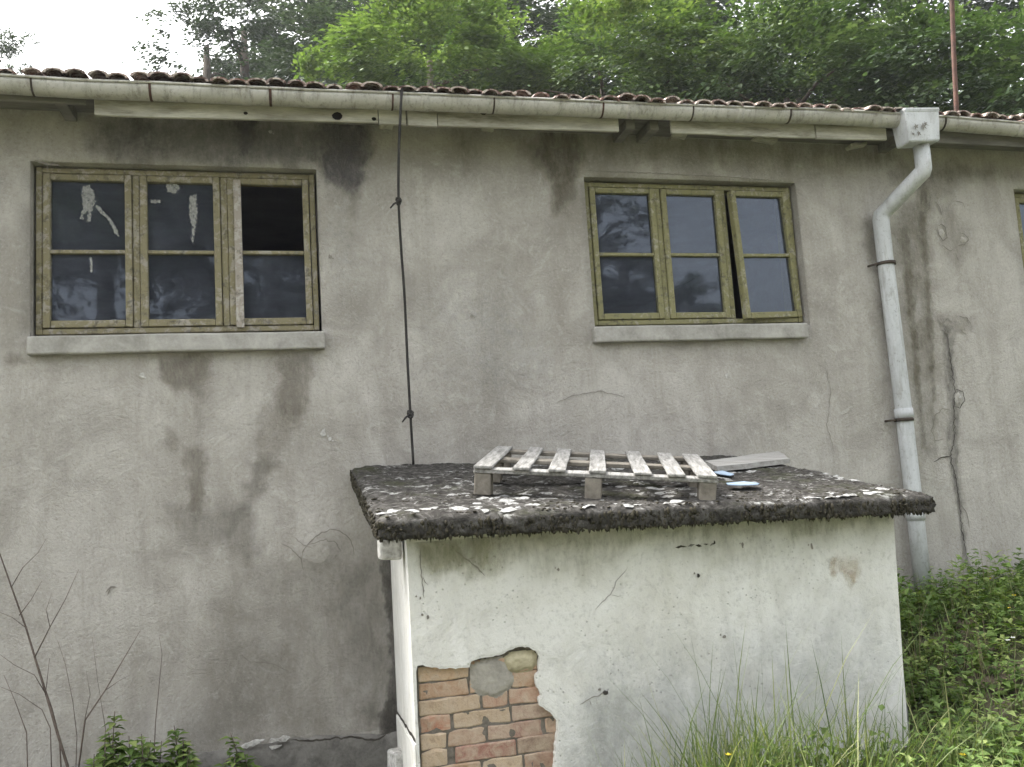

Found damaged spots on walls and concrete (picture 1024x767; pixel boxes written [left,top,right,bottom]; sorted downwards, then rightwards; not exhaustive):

crack [931,328,969,564]
crack [292,712,415,742]
spalling [416,643,561,767]